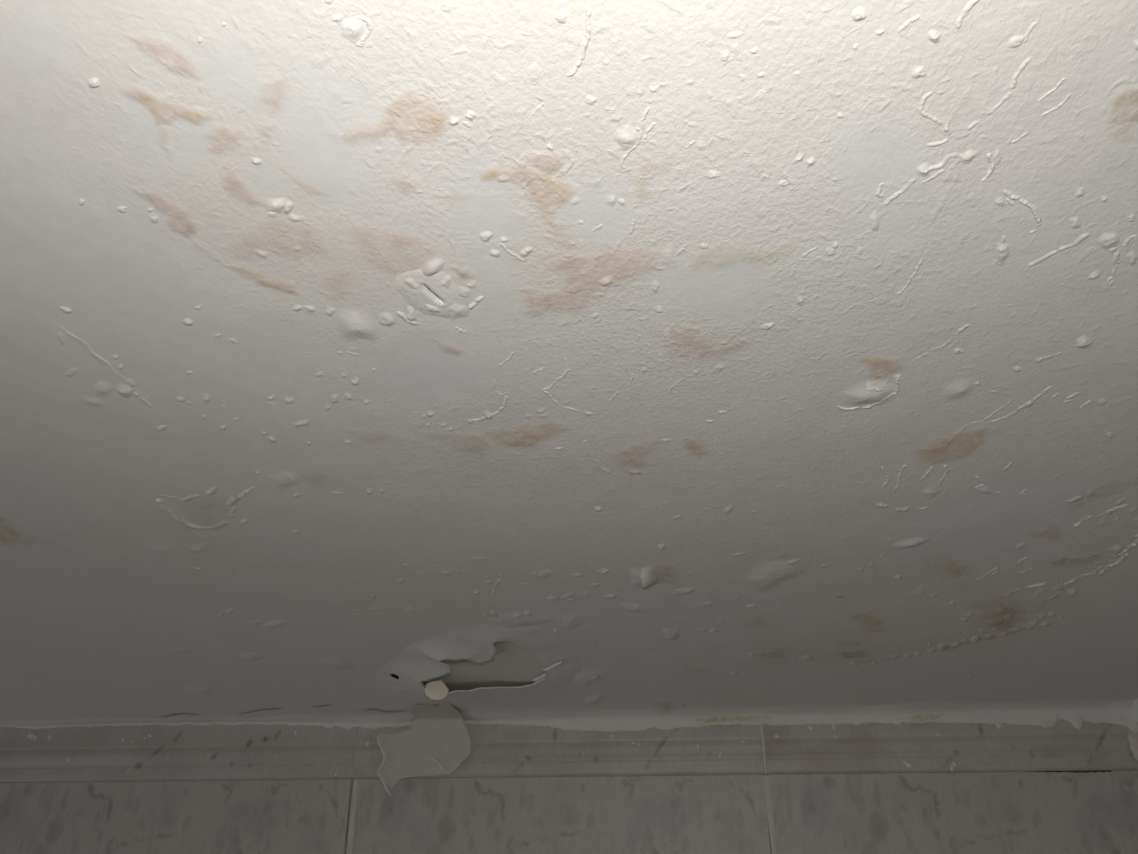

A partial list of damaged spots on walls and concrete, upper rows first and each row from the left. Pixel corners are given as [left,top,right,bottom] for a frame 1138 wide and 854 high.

leakage [1087,83,1138,176]
leakage [115,64,489,305]
leakage [376,148,799,319]
peeling [376,261,484,333]
leakage [338,415,572,459]
leakage [905,424,994,467]
peeling [1010,498,1138,600]
peeling [376,642,547,796]